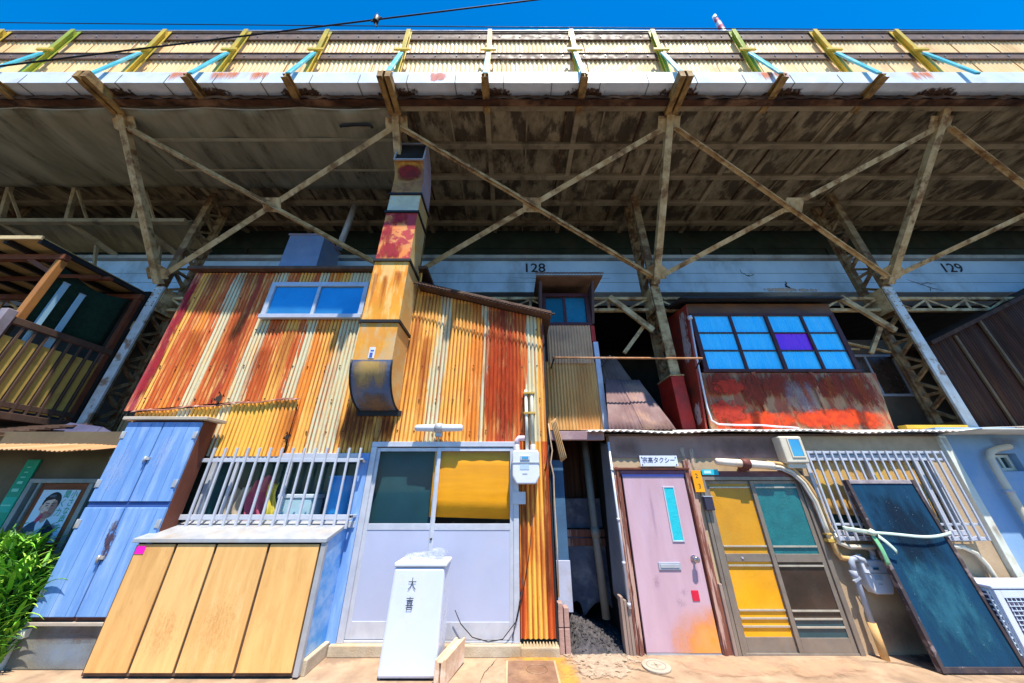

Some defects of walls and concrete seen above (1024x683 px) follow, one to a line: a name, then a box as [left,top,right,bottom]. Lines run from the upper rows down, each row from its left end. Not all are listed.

rust [398,161,420,180]
rust [378,213,407,257]
rust [134,281,199,396]
rust [336,361,394,445]
rust [485,322,520,424]
rust [543,473,552,596]